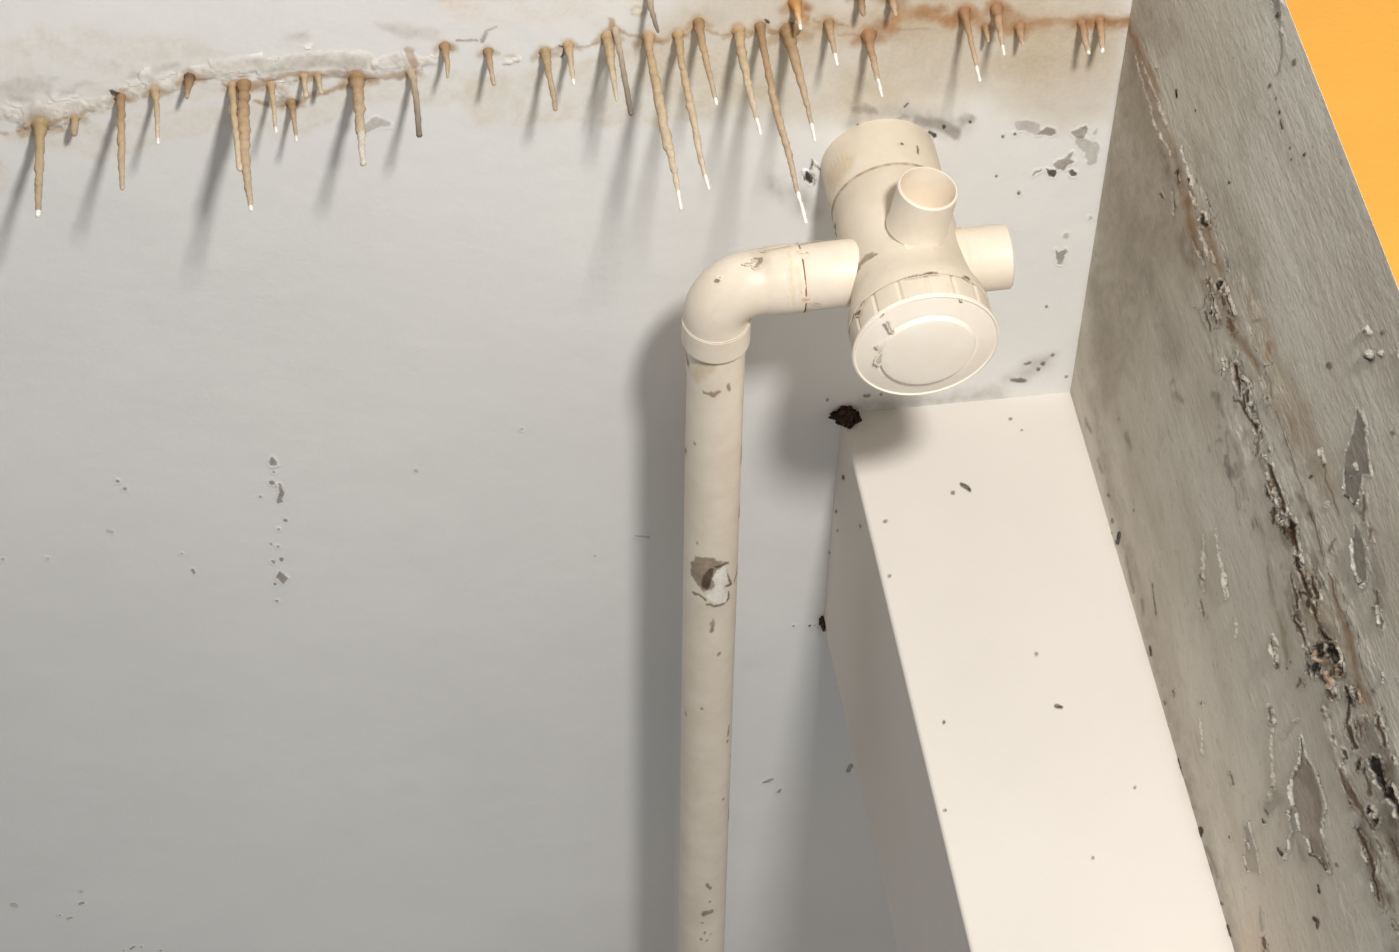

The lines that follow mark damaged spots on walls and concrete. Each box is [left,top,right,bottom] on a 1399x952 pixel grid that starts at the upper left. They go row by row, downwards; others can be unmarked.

rust [628,3,649,19]
leakage [0,14,253,197]
peeling [1000,116,1103,198]
rust [783,0,1343,512]
crack [1157,163,1213,232]
leakage [249,0,1247,952]
leakage [1206,387,1258,532]
crack [1201,273,1348,651]
peeling [1341,406,1389,637]
rust [1287,561,1377,713]
peeling [1242,733,1340,895]
spalling [1293,621,1399,881]